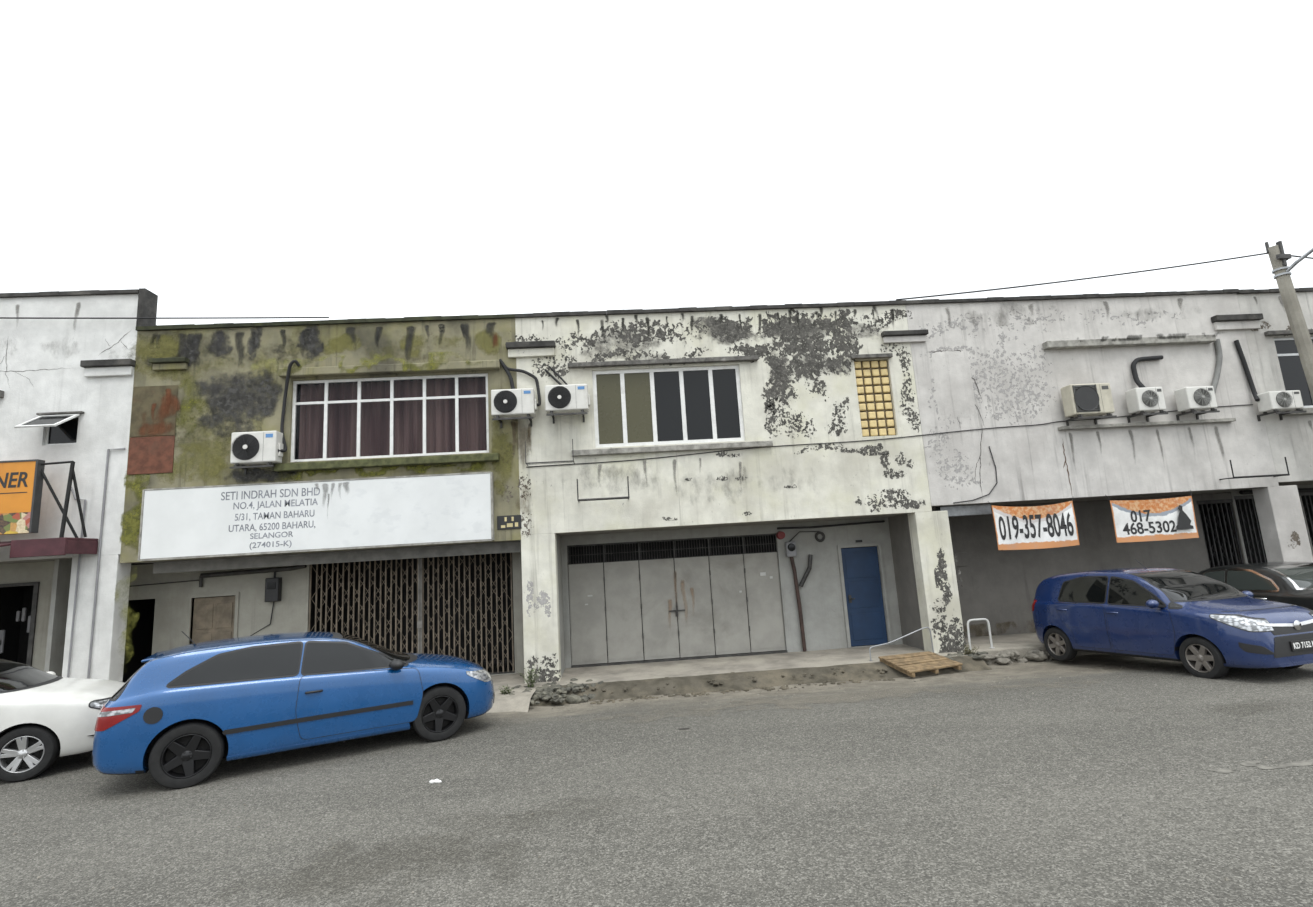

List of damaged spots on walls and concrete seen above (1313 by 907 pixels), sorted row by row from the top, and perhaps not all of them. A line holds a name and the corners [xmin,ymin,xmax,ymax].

leakage [151,327,262,366]
leakage [280,326,324,357]
leakage [405,324,444,357]
leakage [461,324,470,344]
mould [196,367,282,449]
peeling [504,307,1181,512]
crack [933,350,983,491]
flaking render [931,548,967,653]